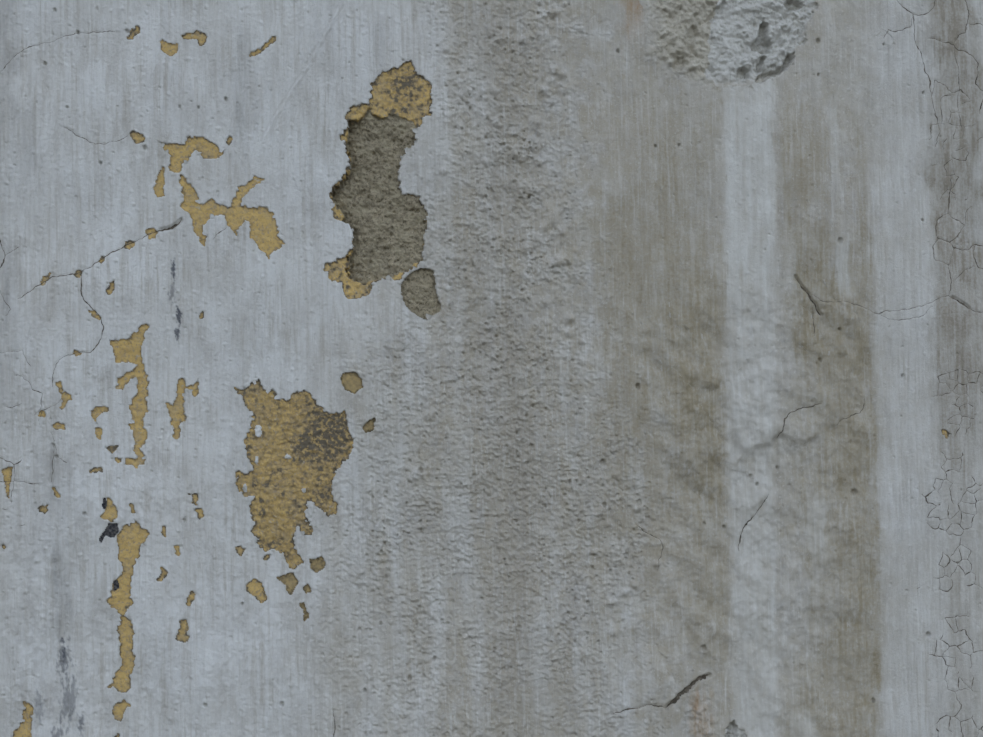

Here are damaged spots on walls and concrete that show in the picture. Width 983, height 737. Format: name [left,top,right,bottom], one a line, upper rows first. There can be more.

peeling [160,30,207,56]
spalling [638,0,818,91]
peeling [153,136,285,259]
spalling [323,60,441,321]
crack [796,0,983,336]
peeling [91,324,150,469]
peeling [165,378,199,439]
peeling [363,418,376,433]
peeling [234,379,353,621]
peeling [100,498,166,737]
peeling [13,701,34,737]
crack [615,674,709,713]